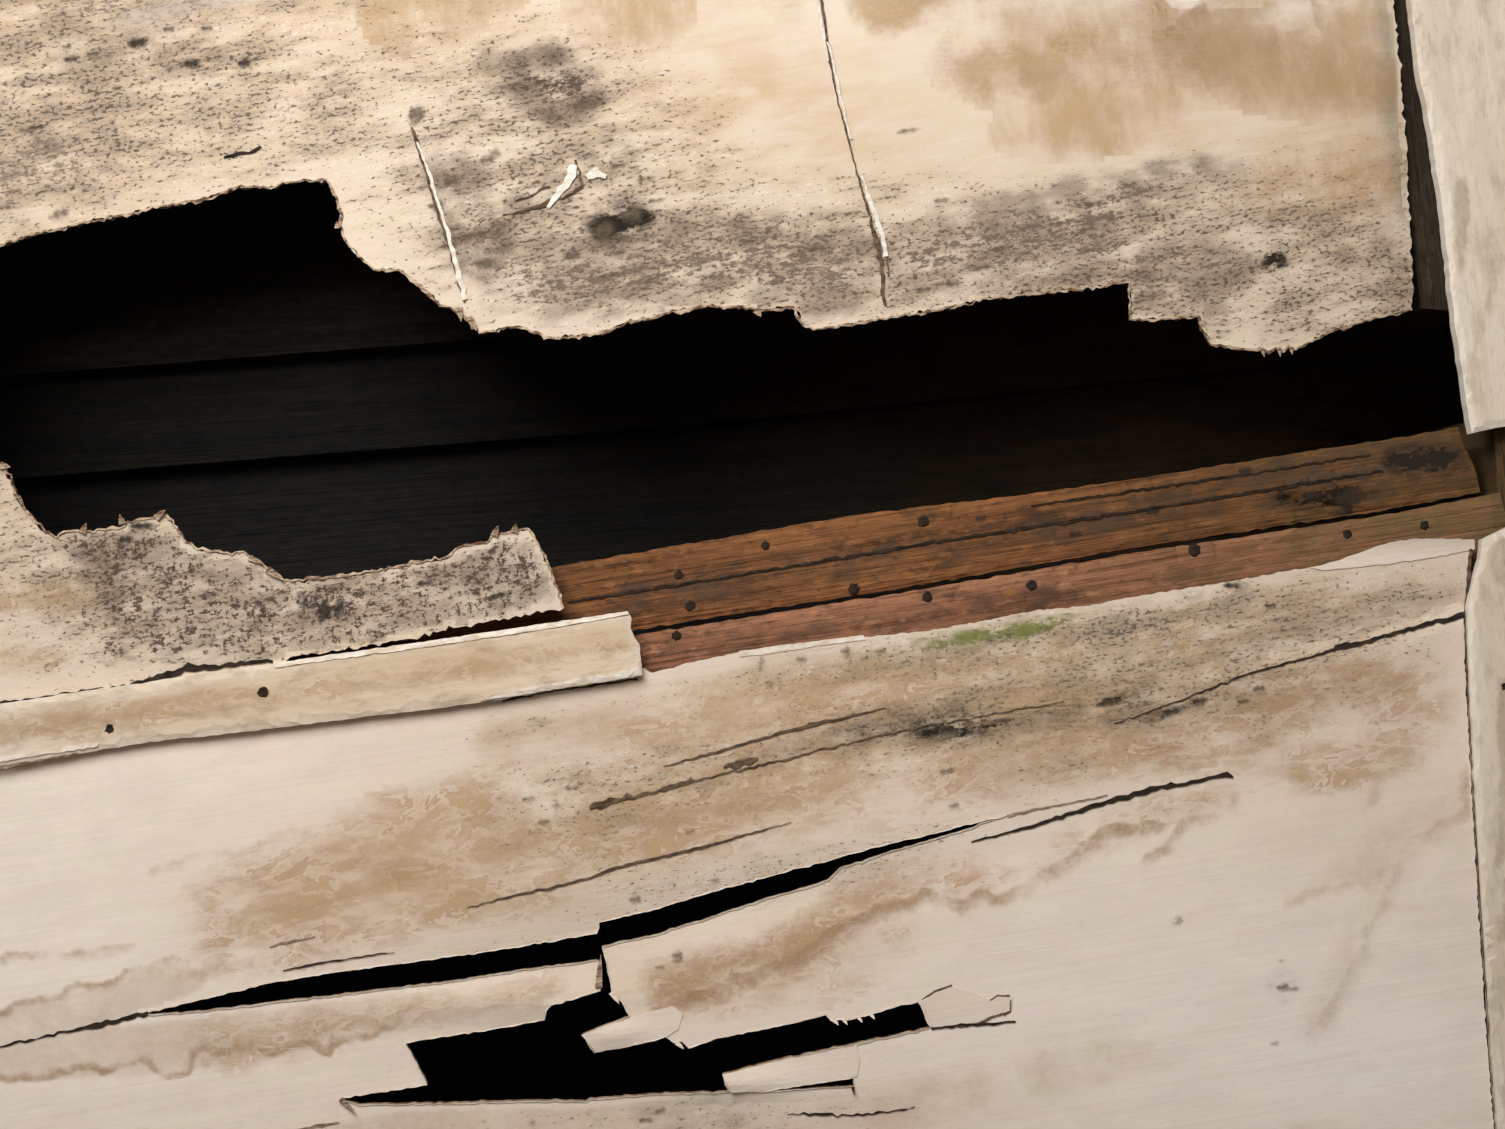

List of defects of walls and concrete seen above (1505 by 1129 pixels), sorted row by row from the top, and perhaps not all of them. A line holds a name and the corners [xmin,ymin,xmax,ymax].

crack [410,127,468,302]
mould [429,151,862,310]
crack [816,0,890,306]
damp [894,168,1286,306]
crack [0,659,273,704]
mould [62,523,549,661]
peeling [273,611,628,668]
peeling [739,635,866,657]
peeling [1311,538,1475,570]
crack [589,701,1064,810]
damp [380,640,1319,925]
crack [467,822,791,908]